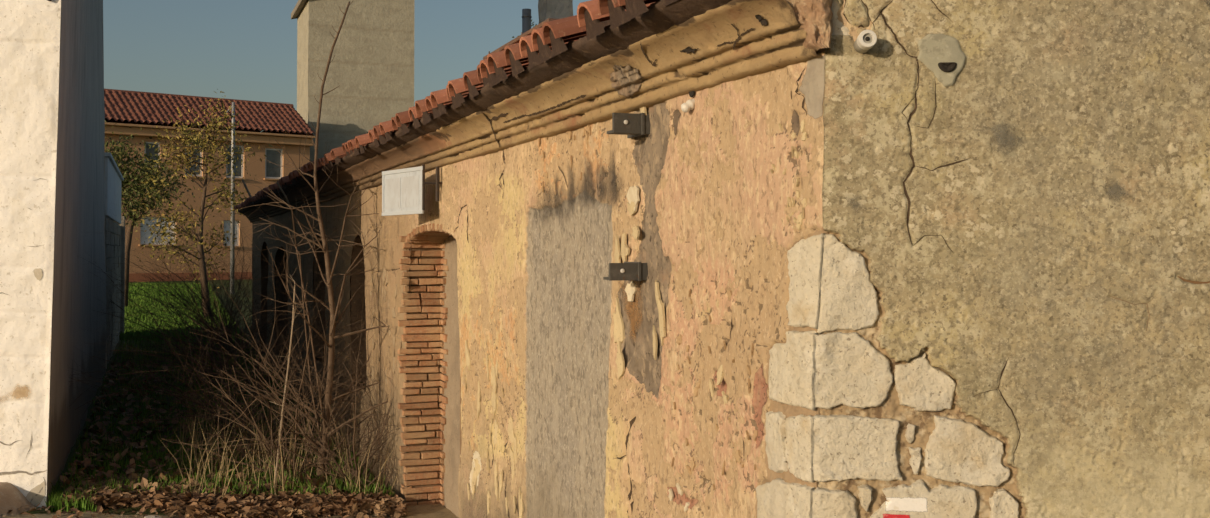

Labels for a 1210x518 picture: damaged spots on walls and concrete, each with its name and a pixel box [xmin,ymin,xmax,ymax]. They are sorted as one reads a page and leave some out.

spalling [613,102,691,399]
spalling [694,56,1019,518]
crack [843,0,969,254]